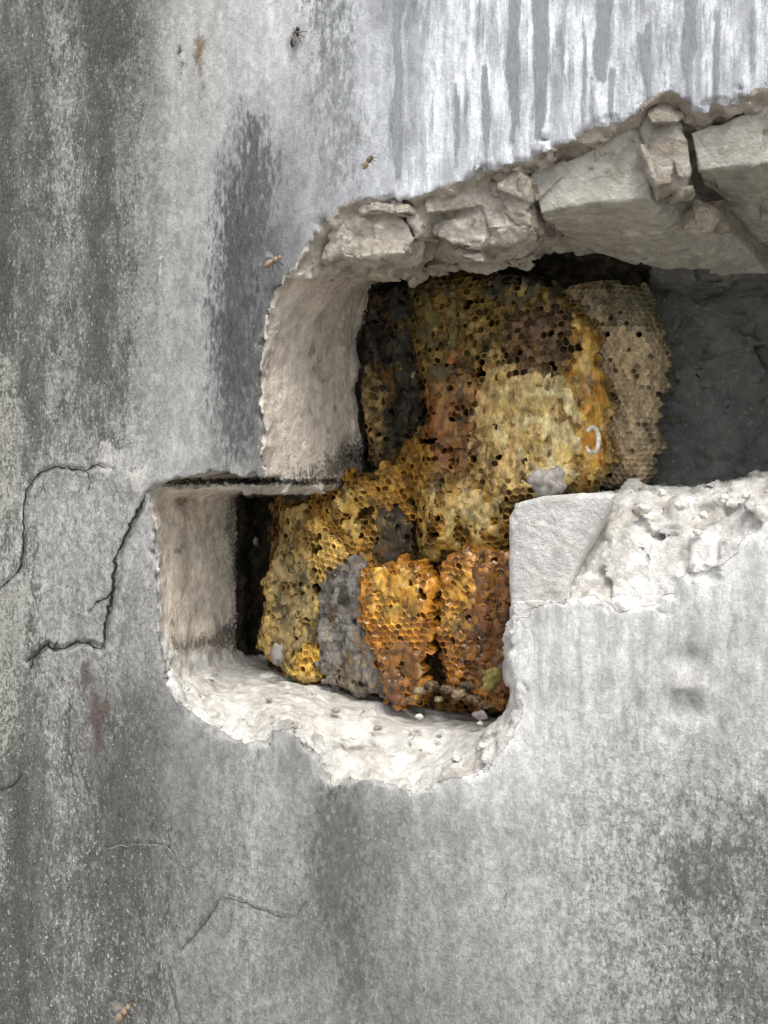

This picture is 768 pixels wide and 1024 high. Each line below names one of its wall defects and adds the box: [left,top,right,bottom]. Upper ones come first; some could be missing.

leakage [382,0,433,180]
leakage [454,0,493,171]
leakage [505,0,741,145]
leakage [742,0,768,84]
leakage [203,111,282,466]
crack [1,464,110,588]
crack [27,494,146,668]
spalling [98,88,768,794]
crack [167,894,304,1024]